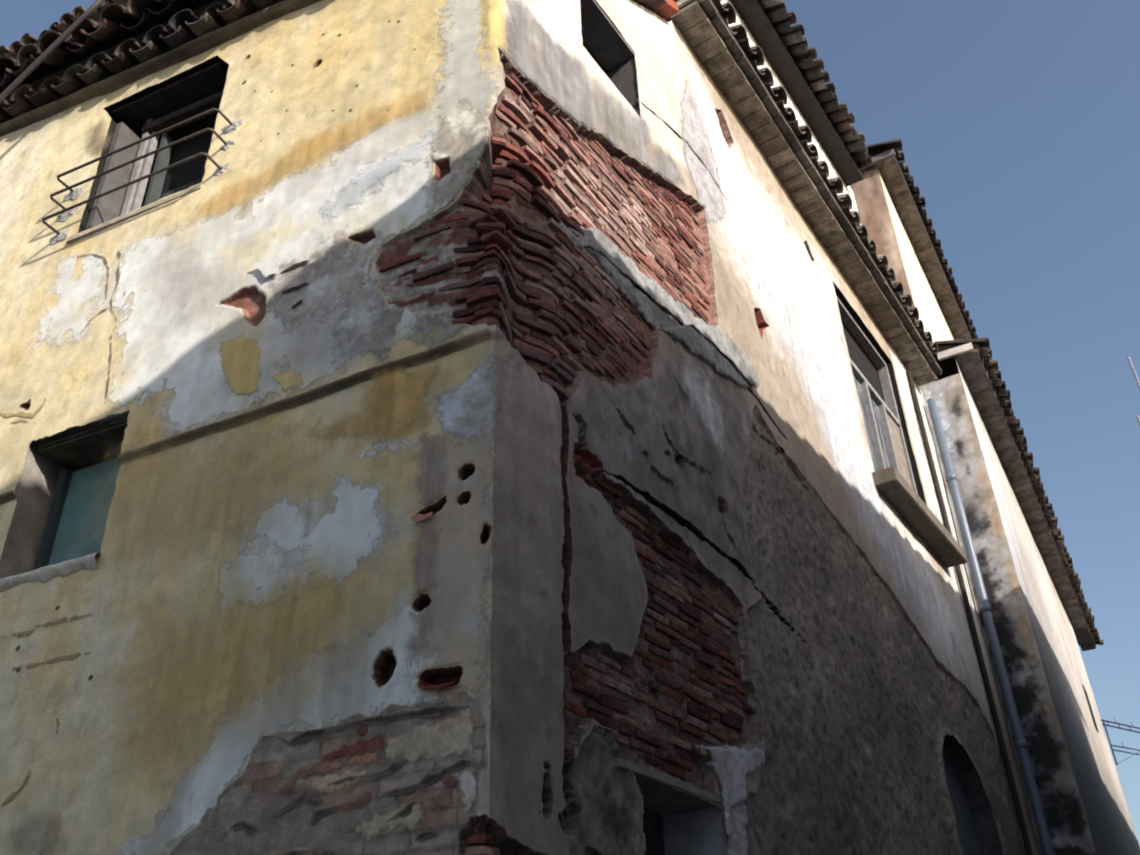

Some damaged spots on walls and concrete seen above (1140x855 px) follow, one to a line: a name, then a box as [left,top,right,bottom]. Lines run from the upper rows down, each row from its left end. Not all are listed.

flaking render [28,0,718,436]
flaking render [121,426,547,855]
crack [562,743,575,786]
crack [560,404,807,655]
crack [748,387,807,488]
flaking render [539,405,1026,855]
mould [924,385,968,469]
mould [965,504,991,535]
mould [966,549,1096,855]